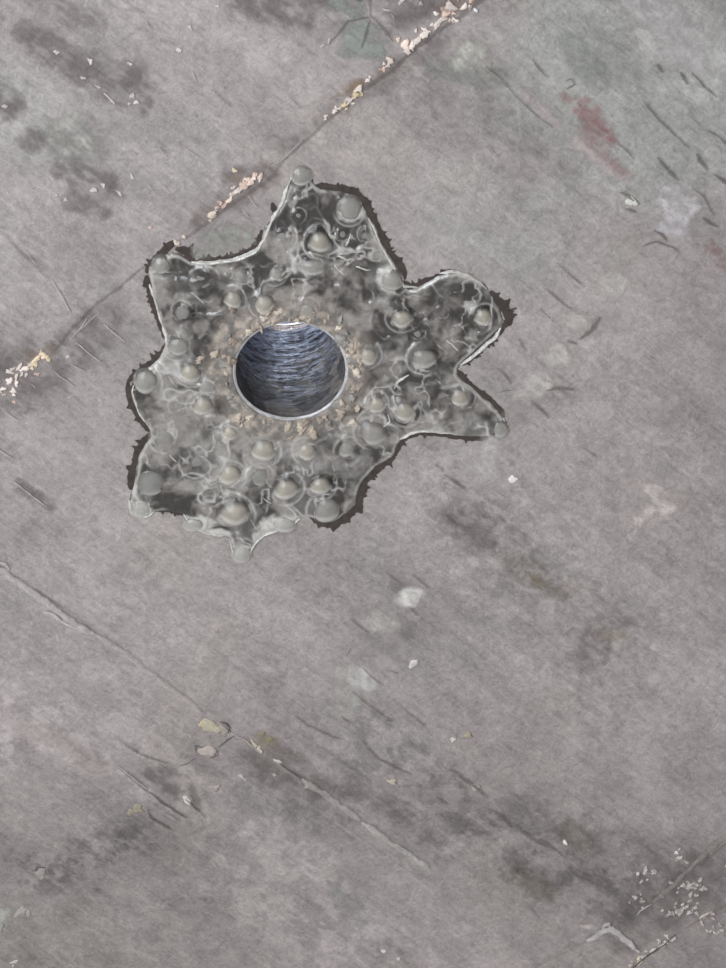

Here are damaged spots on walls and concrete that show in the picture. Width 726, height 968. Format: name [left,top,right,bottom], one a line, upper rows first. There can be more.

peeling [396,0,478,55]
peeling [323,56,394,120]
peeling [207,167,263,222]
crack [547,290,600,344]
peeling [0,349,51,404]
leakage [125,165,517,564]
leakage [517,343,570,398]
leakage [399,588,423,606]
leakage [333,667,375,715]
crack [180,722,235,766]
crack [119,767,206,830]
crack [628,906,724,968]